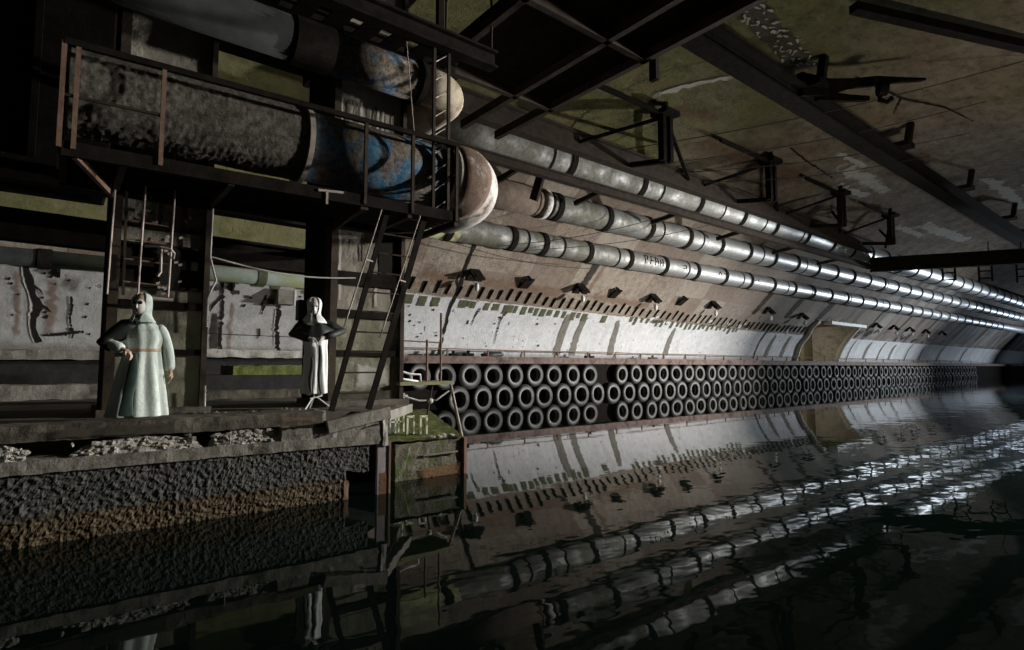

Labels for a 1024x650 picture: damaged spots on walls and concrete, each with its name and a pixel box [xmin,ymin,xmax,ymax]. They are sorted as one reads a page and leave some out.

spalling [739,2,816,74]
leakage [210,314,218,349]